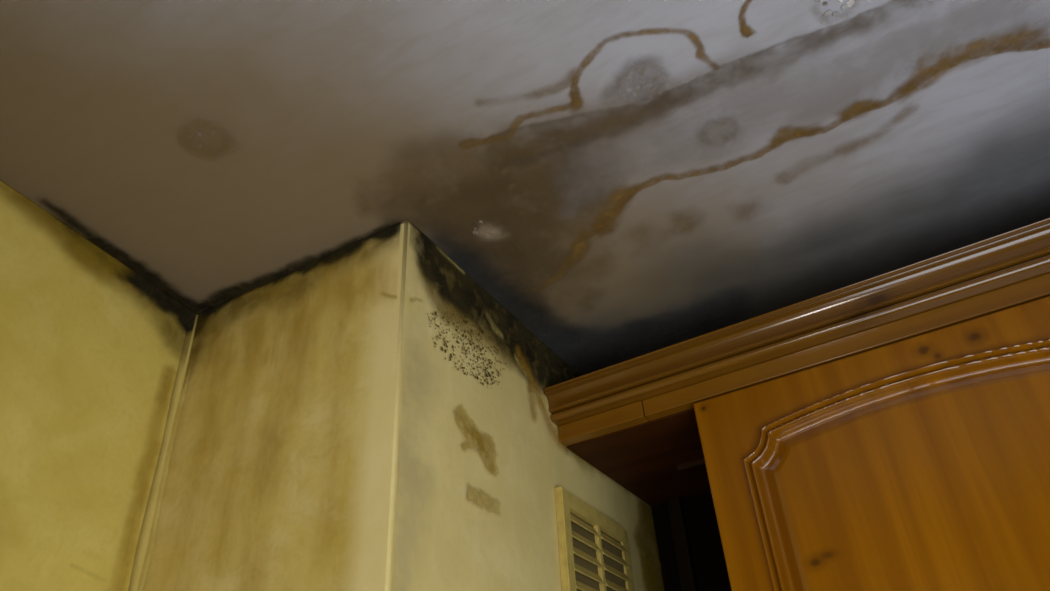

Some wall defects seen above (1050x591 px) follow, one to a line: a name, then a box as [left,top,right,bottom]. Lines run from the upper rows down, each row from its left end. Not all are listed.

damp [739,0,752,37]
damp [18,192,405,358]
damp [407,29,1050,388]
peeling [456,406,498,476]